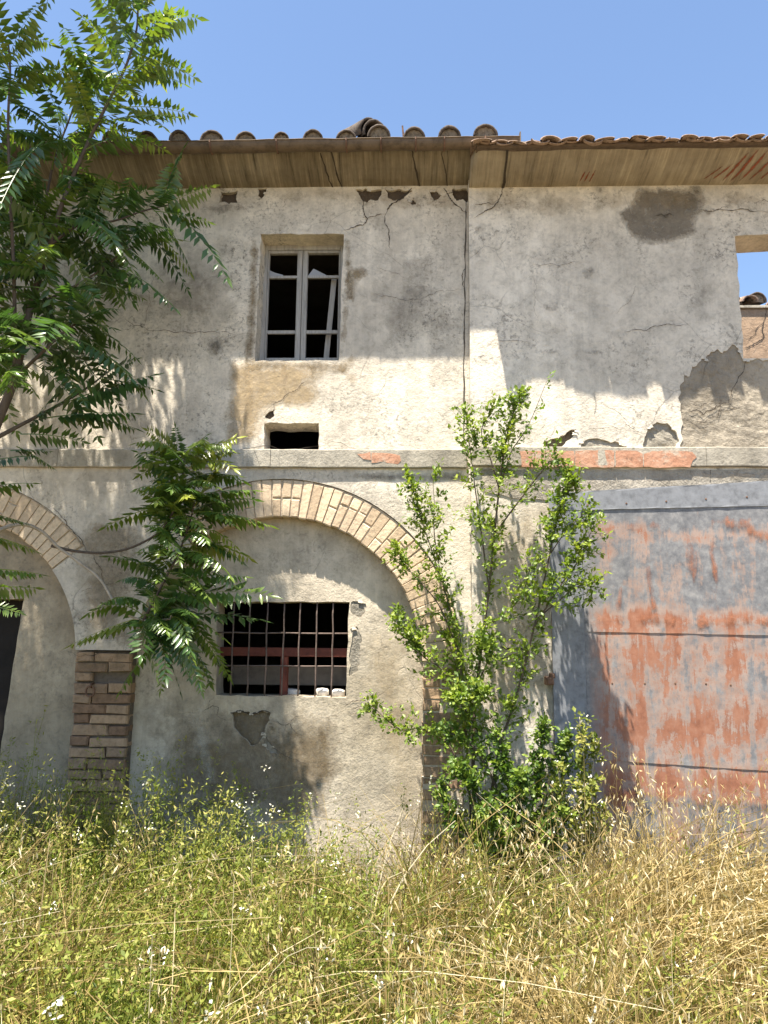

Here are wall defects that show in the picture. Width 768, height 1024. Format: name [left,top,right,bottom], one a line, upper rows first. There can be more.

spalling [221,192,237,204]
spalling [357,188,416,205]
damp [621,189,701,241]
crack [347,150,509,448]
peeling [520,345,768,468]
spalling [358,452,401,464]
peeling [350,599,366,617]
spalling [232,709,277,753]